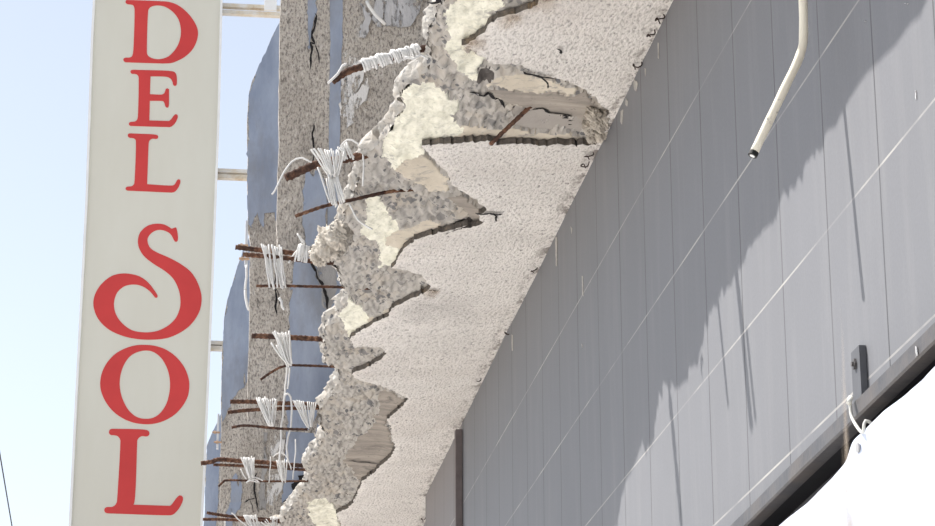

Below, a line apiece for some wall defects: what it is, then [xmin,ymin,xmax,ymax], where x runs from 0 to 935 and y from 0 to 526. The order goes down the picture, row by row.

crack [310,13,320,69]
spalling [201,0,610,526]